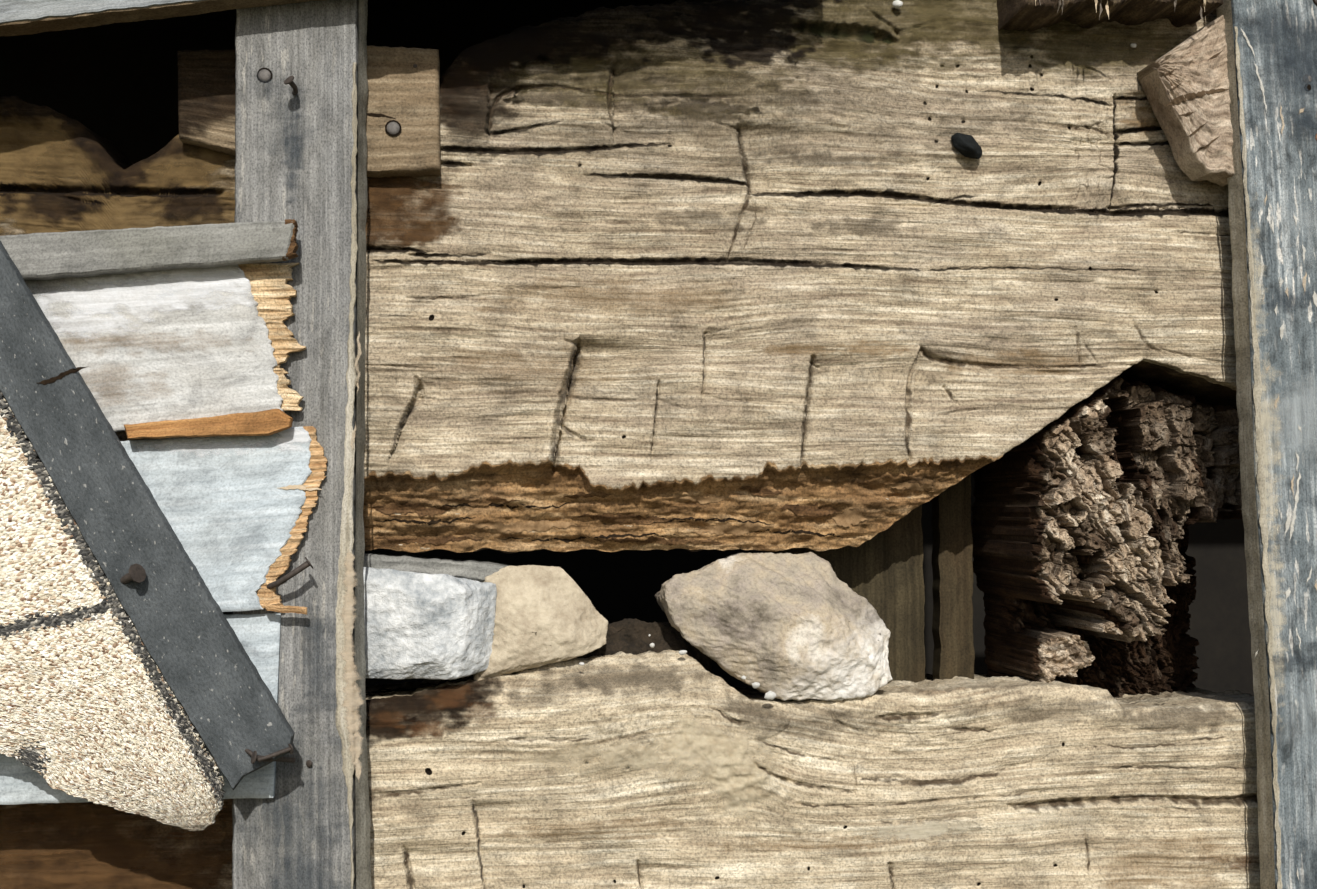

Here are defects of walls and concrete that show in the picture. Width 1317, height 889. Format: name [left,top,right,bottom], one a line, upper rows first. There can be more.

water stain [439,0,1180,143]
crack [366,50,1230,288]
water stain [793,154,866,163]
peeling [37,265,251,332]
peeling [260,427,310,450]
crack [392,406,414,448]
crack [552,350,578,460]
crack [802,366,812,451]
crack [905,388,913,453]
crack [921,332,1149,411]
crack [404,852,413,885]
crack [386,783,483,879]